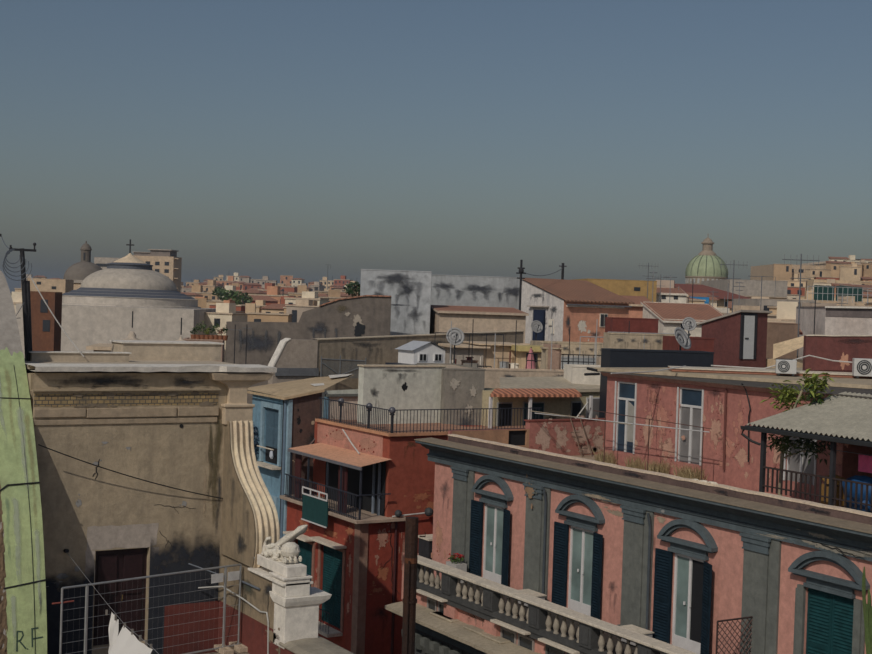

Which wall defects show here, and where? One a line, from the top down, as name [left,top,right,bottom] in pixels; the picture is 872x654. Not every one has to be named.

leakage [385,274,412,305]
leakage [65,377,138,386]
peeling [525,415,605,456]
peeling [703,395,753,479]
peeling [372,522,405,585]